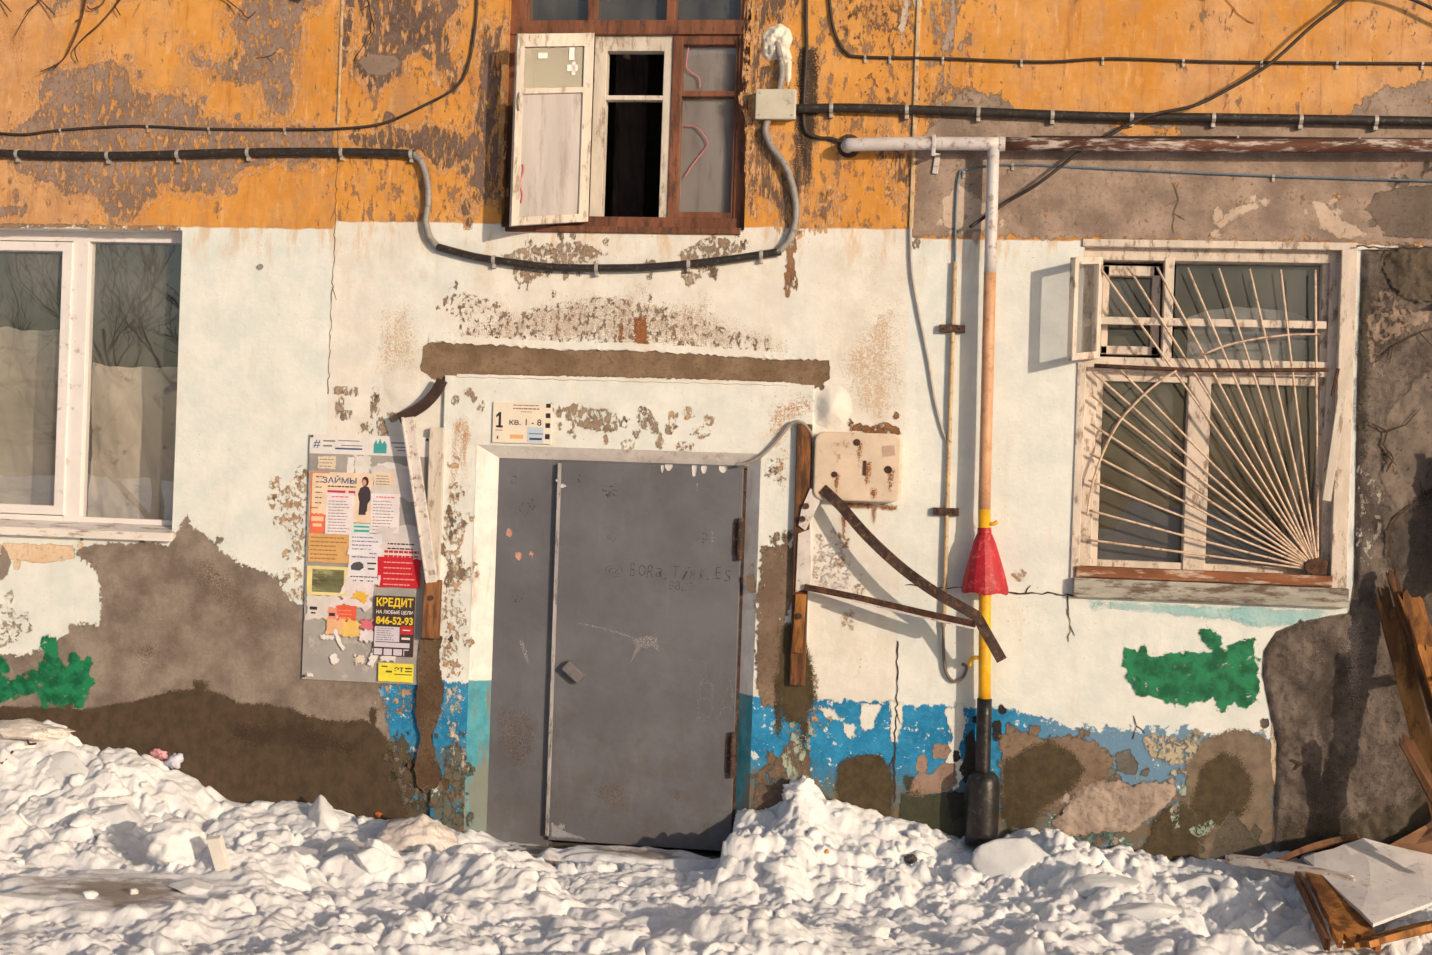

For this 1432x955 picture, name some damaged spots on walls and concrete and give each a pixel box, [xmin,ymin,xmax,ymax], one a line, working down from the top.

peeling [0,0,511,231]
peeling [679,0,843,287]
peeling [333,386,398,436]
spalling [420,232,831,412]
peeling [551,402,727,477]
spalling [828,0,1432,860]
peeling [0,456,480,830]
spalling [748,665,904,810]